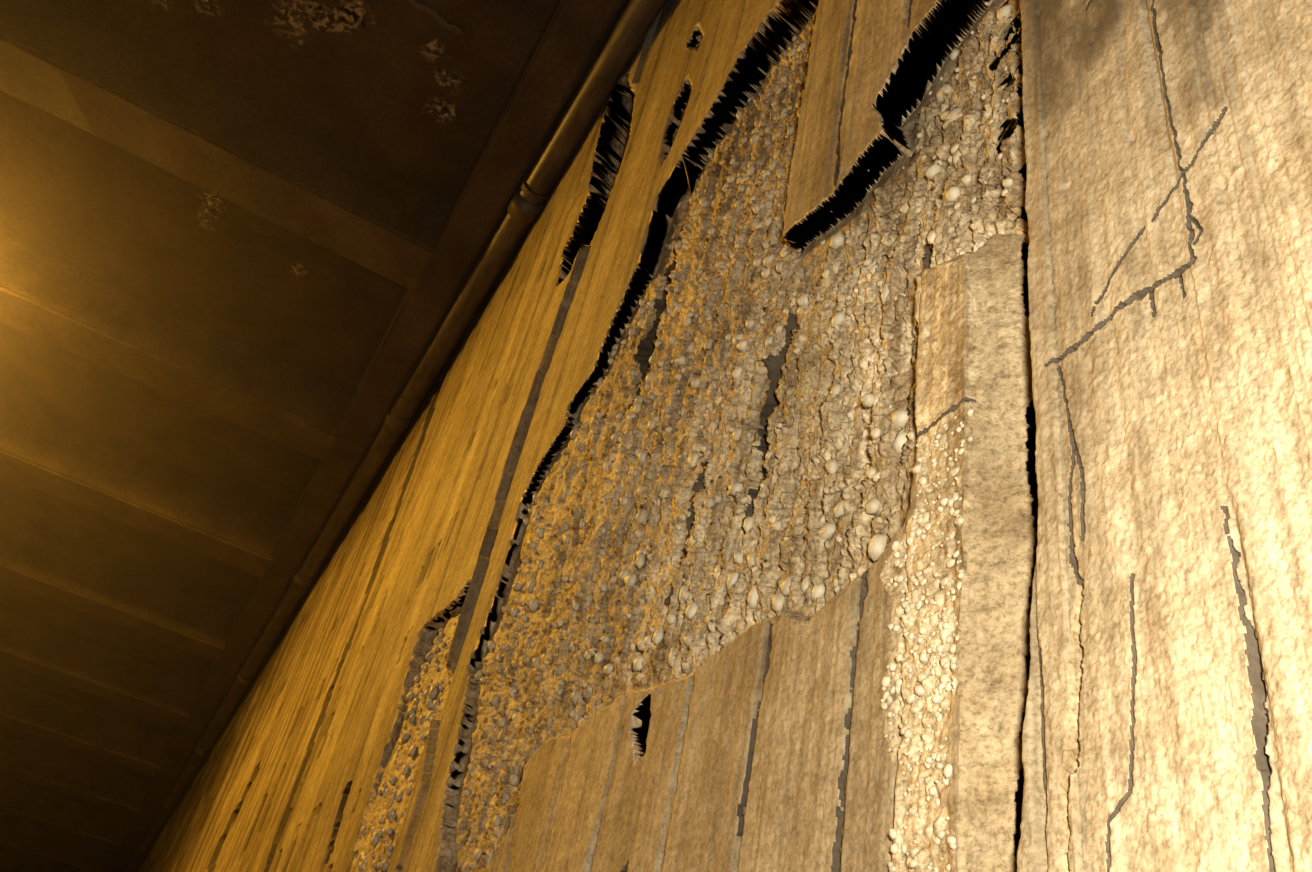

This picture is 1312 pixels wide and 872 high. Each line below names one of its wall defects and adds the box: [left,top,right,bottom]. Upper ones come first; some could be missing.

spalling [350,0,1029,872]
crack [1039,0,1227,872]
crack [1220,506,1275,872]